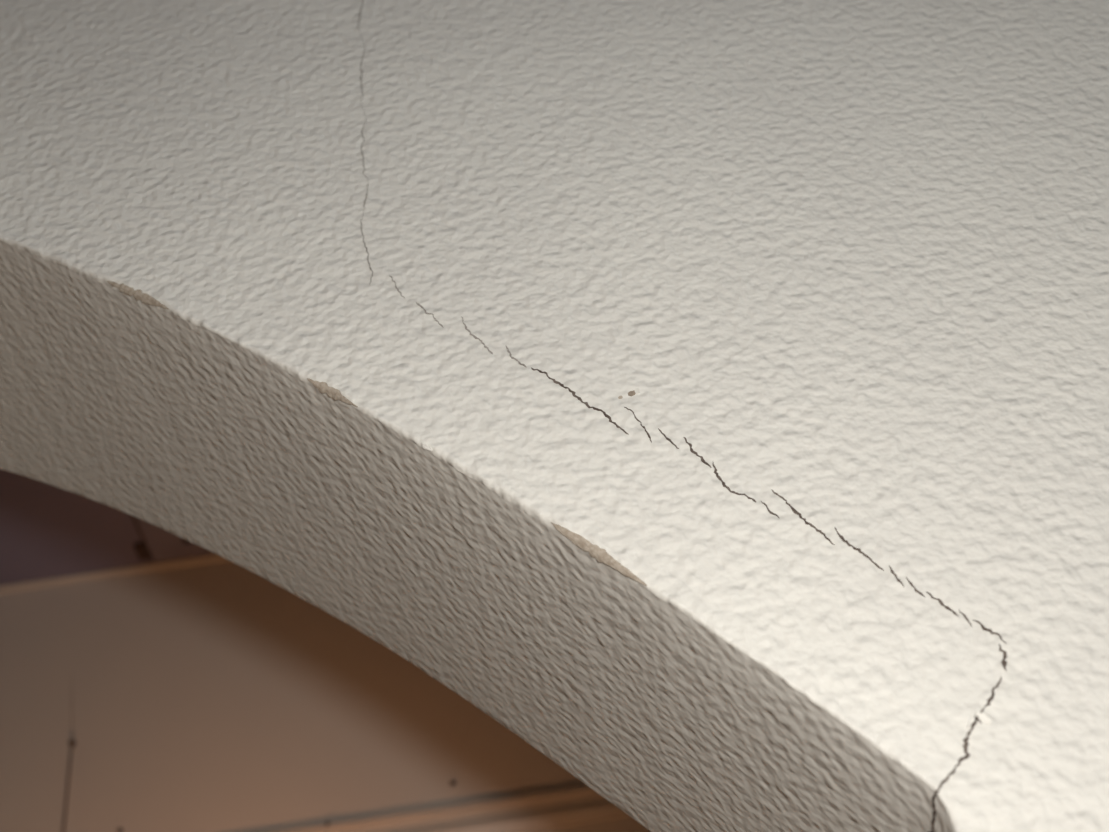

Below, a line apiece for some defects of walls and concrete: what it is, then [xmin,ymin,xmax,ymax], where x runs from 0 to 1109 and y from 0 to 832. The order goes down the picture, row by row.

crack [357,0,1007,832]